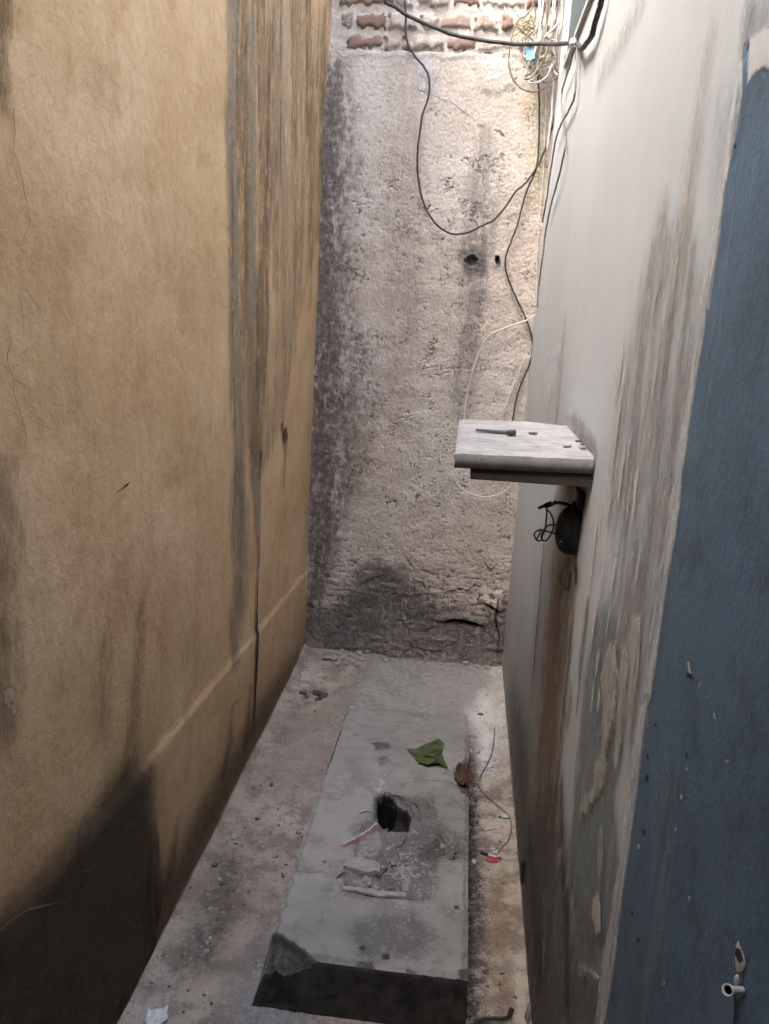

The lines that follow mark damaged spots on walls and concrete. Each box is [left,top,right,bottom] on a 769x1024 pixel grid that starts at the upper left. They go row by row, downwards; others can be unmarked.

crack [253,434,263,734]
water stain [225,0,509,794]
peeling [578,0,769,1024]
water stain [0,669,291,1024]
spalling [265,933,314,975]
spalling [337,794,467,901]